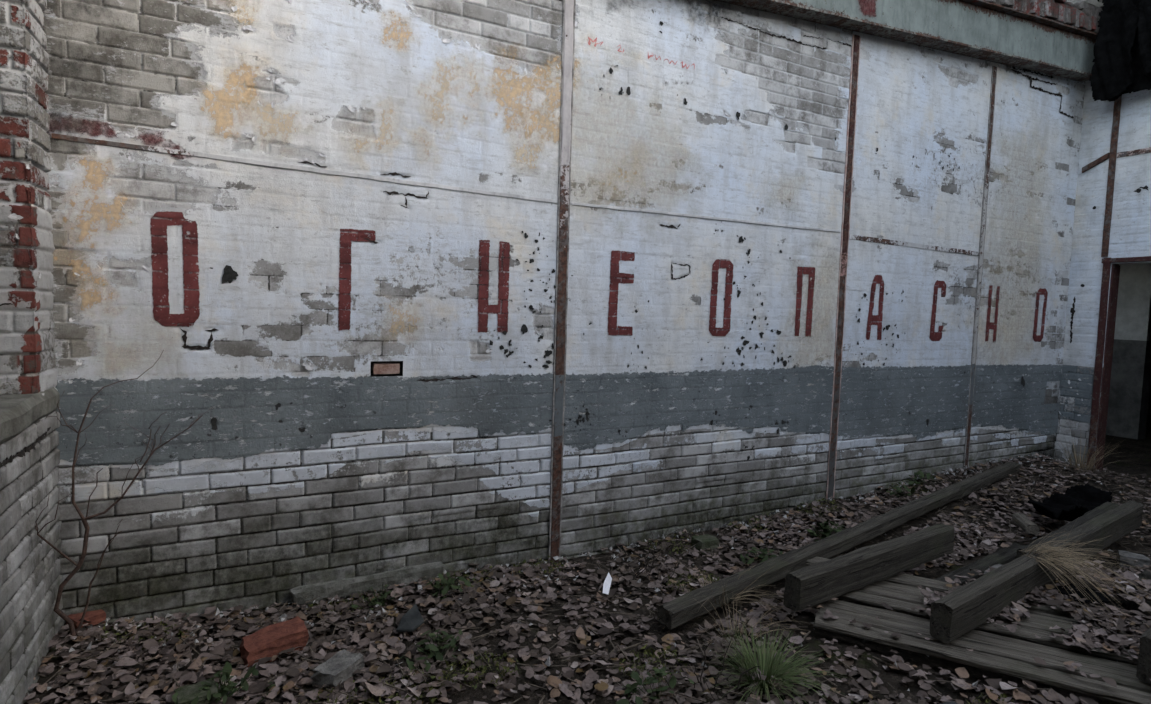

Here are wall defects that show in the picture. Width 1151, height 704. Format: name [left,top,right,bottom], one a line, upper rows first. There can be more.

rust [859,0,877,17]
water stain [201,64,292,138]
water stain [493,50,580,168]
peeling [700,0,871,193]
peeling [0,0,258,384]